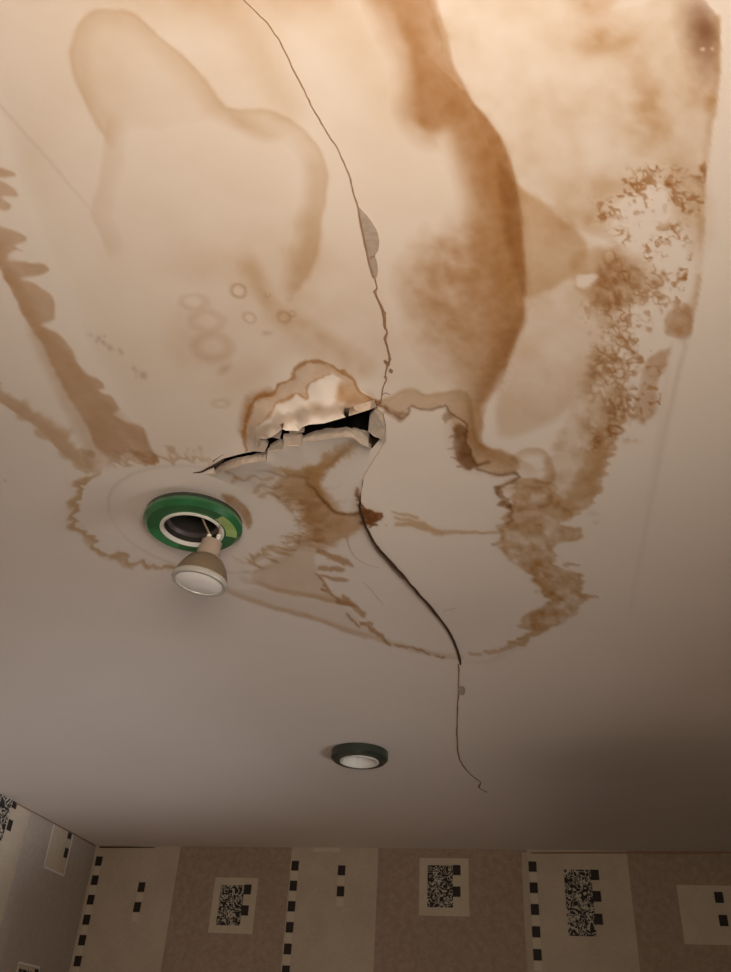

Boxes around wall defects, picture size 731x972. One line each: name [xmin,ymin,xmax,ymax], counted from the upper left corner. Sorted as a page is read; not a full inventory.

crack [244,0,359,208]
crack [194,277,393,474]
leakage [459,430,478,469]
crack [347,479,487,793]